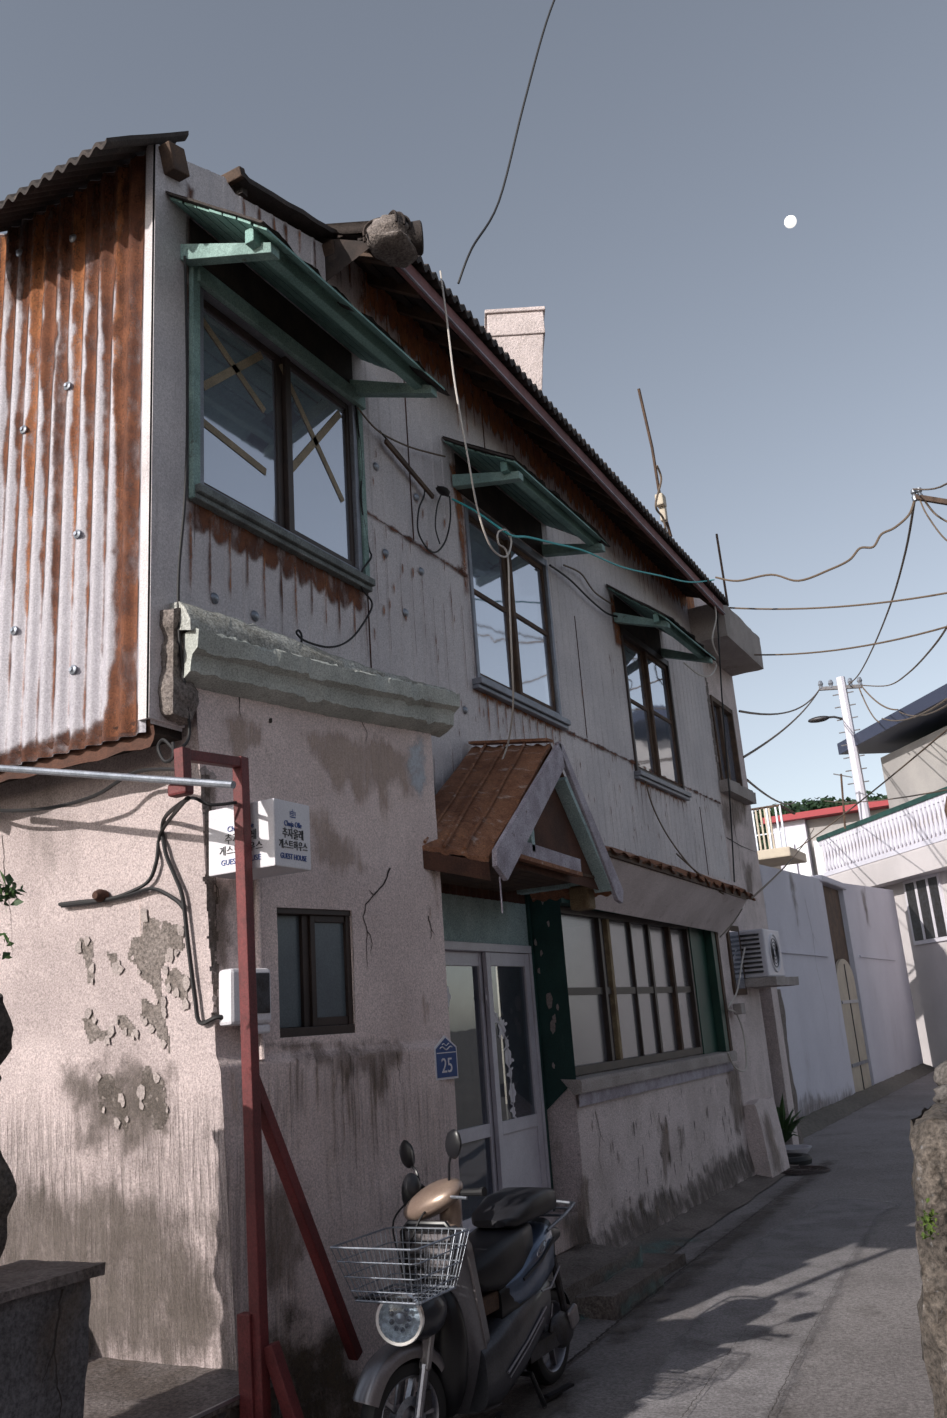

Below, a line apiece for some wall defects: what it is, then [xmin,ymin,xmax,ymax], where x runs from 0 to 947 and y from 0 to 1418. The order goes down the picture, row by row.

corrosion [0,151,146,765]
corrosion [189,464,721,857]
peeling [75,908,190,1053]
peeling [199,766,219,1017]
crack [363,868,391,967]
leakage [66,1066,165,1153]
peeling [96,1066,169,1131]
leakage [564,1146,754,1247]
leakage [0,1184,217,1364]